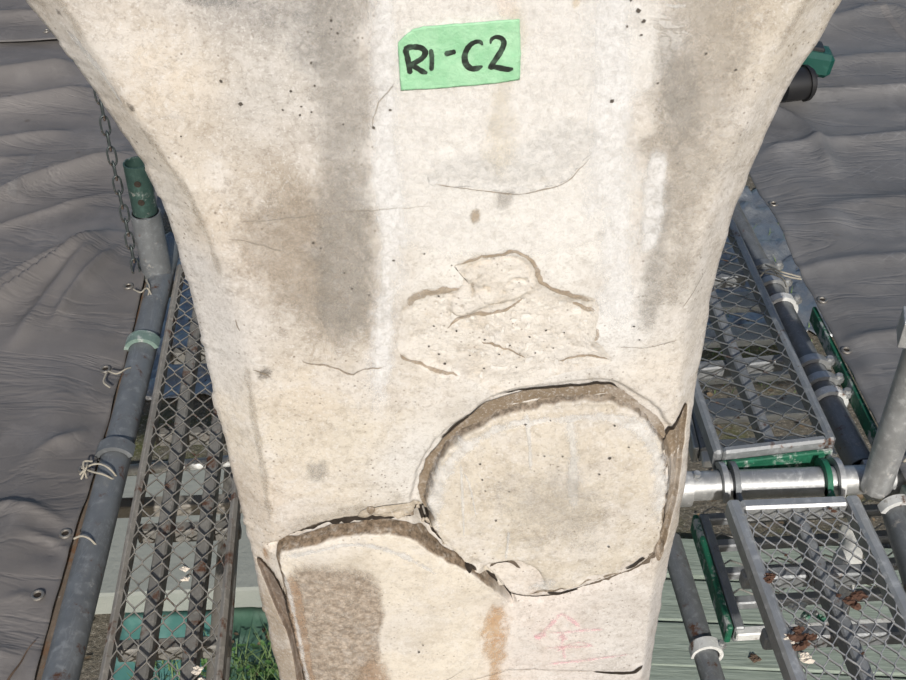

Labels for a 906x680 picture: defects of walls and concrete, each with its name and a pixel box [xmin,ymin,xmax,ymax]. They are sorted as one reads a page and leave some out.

water stain [372,0,406,394]
crack [408,287,458,305]
crack [448,299,522,328]
spalling [396,250,612,394]
crack [463,250,676,361]
crack [307,363,380,375]
crack [401,355,457,376]
crack [294,381,686,539]
crack [465,553,655,597]